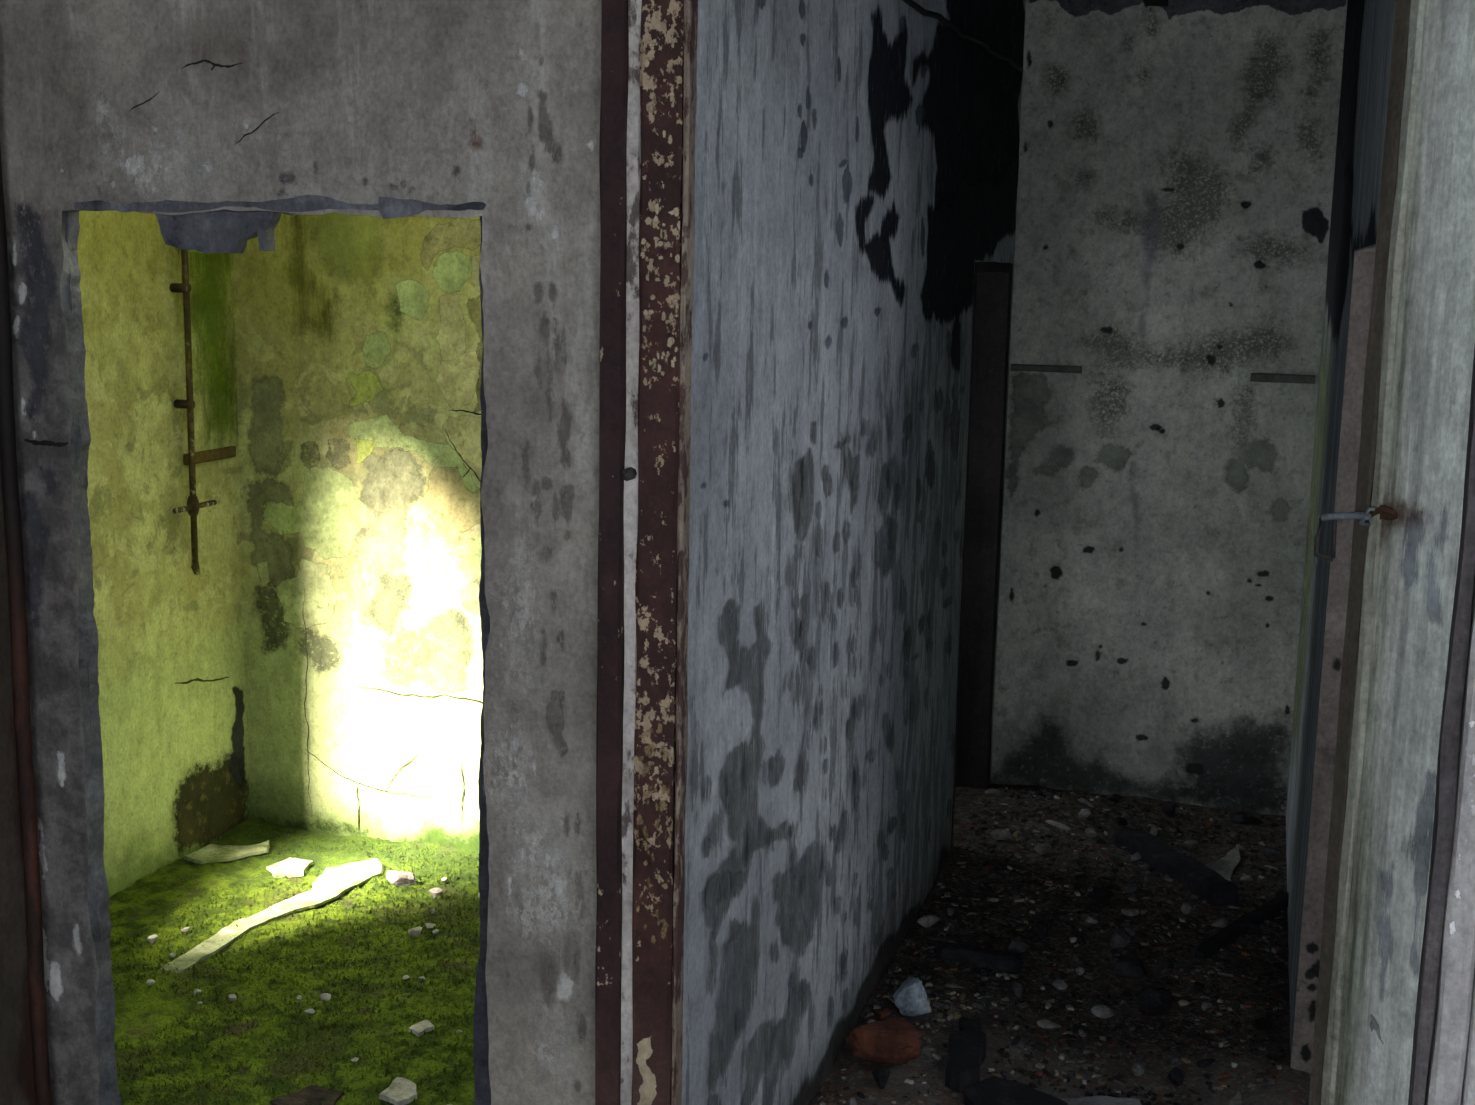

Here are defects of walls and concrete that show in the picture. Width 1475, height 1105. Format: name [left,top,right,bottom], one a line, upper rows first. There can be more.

peeling [798,87,817,158]
peeling [837,160,852,246]
water stain [855,0,1025,373]
water stain [994,0,1365,815]
crack [175,677,245,789]
water stain [255,583,341,672]
spalling [12,82,586,1105]
crack [303,590,482,830]
water stain [364,575,473,694]
peeling [691,385,964,1105]
peeling [636,1037,657,1105]
water stain [793,846,948,1105]